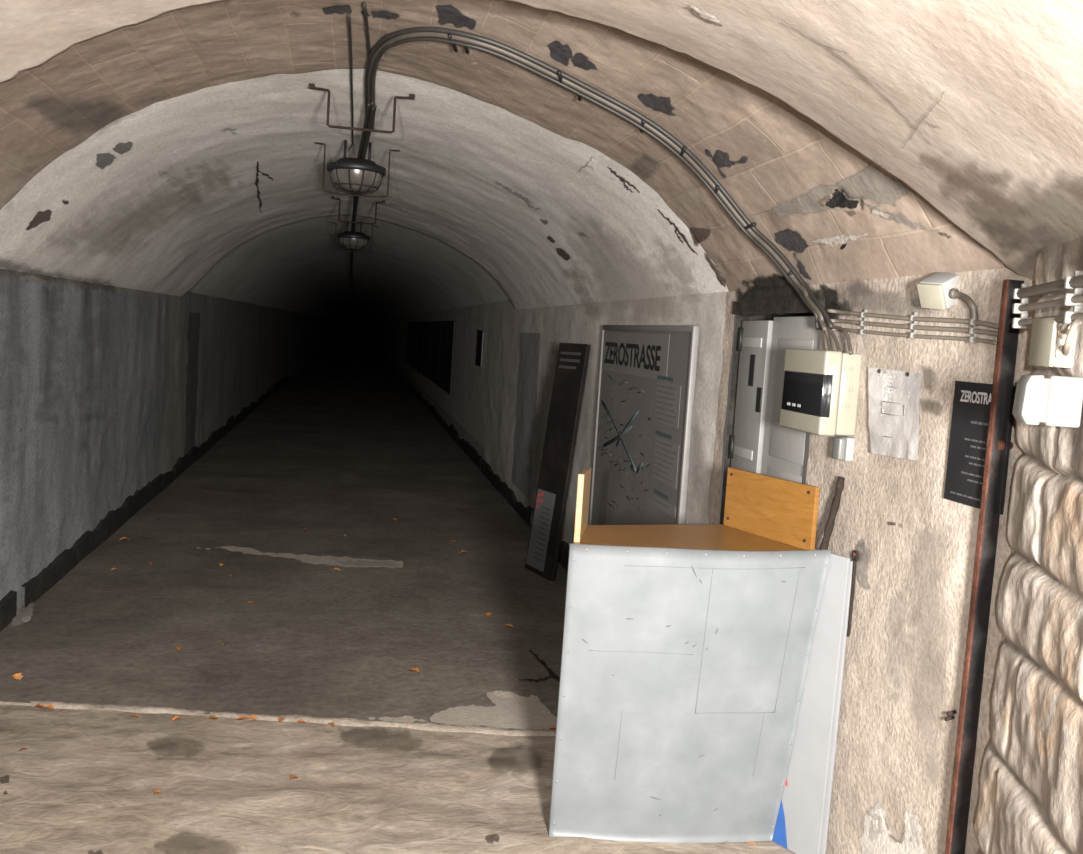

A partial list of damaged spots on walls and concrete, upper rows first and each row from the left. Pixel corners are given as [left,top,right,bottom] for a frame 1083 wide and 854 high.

peeling [96,142,133,169]
crack [255,161,274,212]
spalling [819,189,859,216]
water stain [974,186,1083,266]
crack [519,650,560,683]
peeling [368,690,557,730]
flaking render [859,799,925,854]